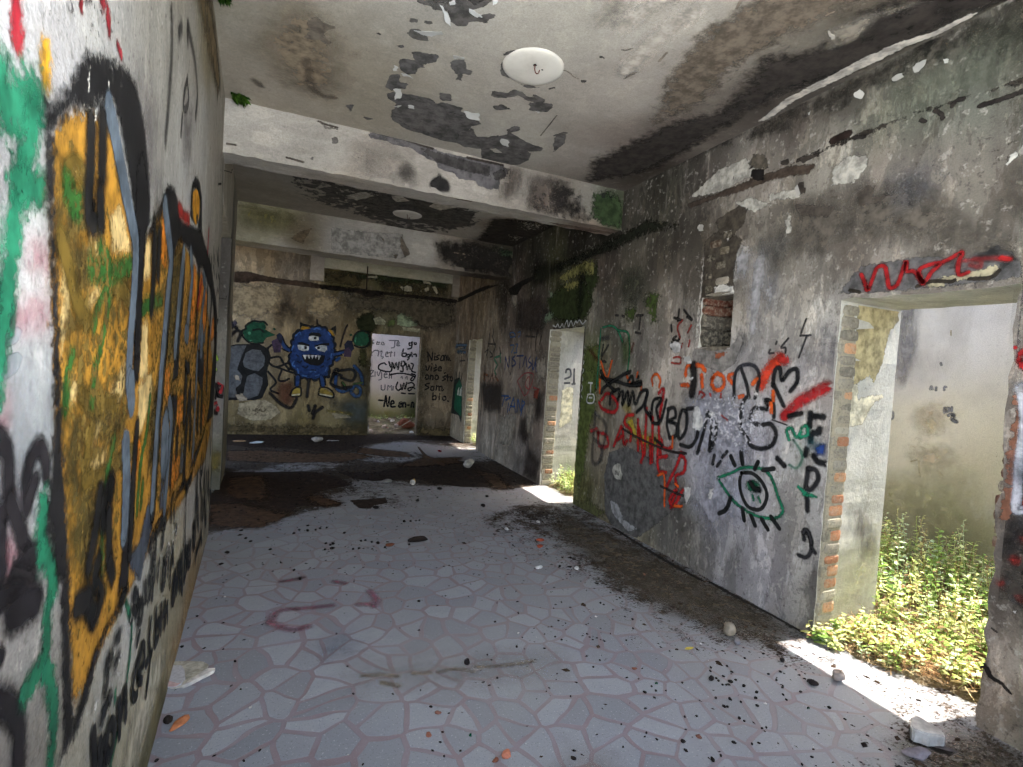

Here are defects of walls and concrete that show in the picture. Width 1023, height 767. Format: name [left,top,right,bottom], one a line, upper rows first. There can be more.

peeling [369,0,567,190]
water stain [586,0,1023,182]
peeling [291,176,481,233]
water stain [556,218,679,269]
peeling [692,154,768,197]
flaking render [669,182,806,373]
peeling [781,153,819,165]
water stain [688,101,953,208]
peeling [831,155,868,186]
water stain [736,185,1011,332]
peeling [692,390,775,453]
flaking render [999,392,1020,520]